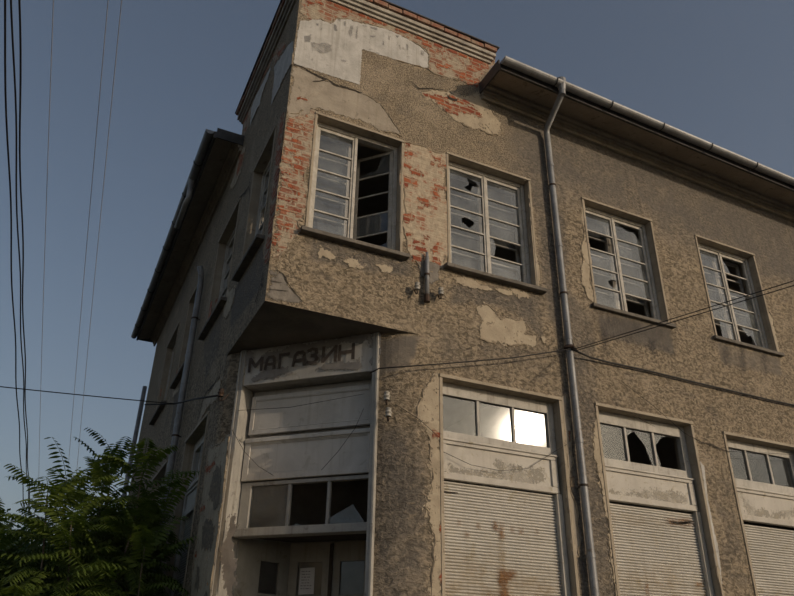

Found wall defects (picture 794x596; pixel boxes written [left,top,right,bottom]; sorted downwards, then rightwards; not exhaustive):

peeling [242,0,503,284]
flaking render [526,192,542,285]
flaking render [454,275,530,300]
flaking render [477,301,546,349]